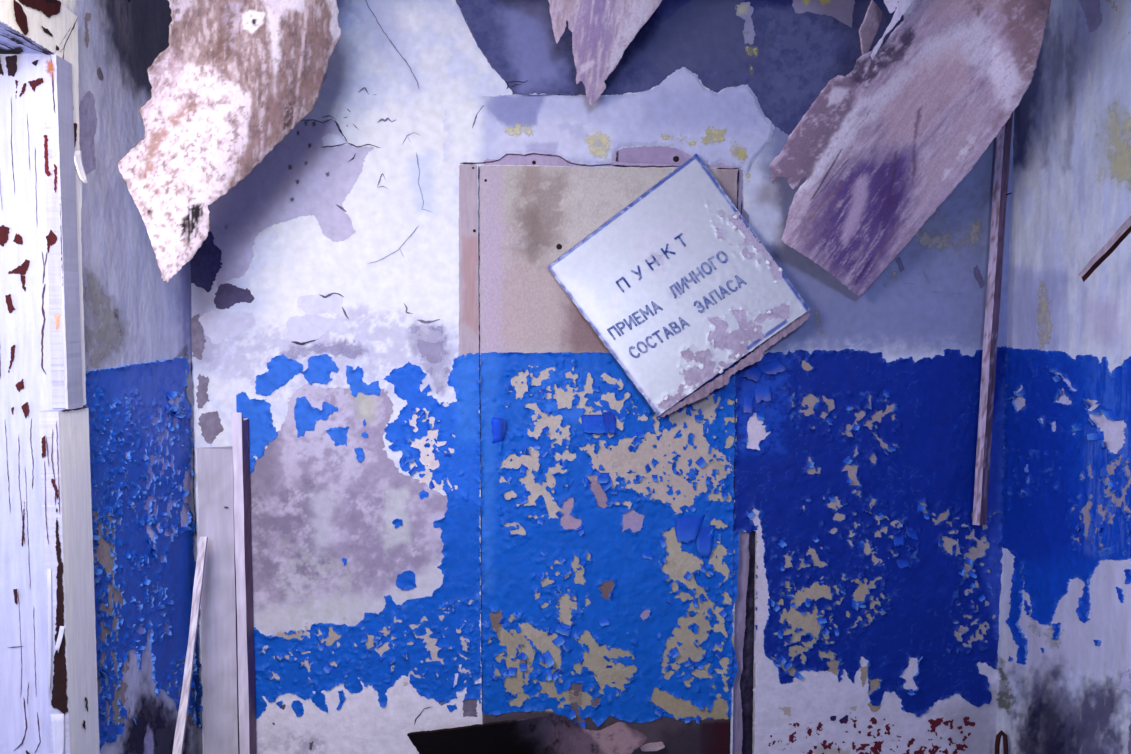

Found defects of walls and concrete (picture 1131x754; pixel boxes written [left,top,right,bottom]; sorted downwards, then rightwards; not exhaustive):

spalling [616,146,686,164]
spalling [83,314,224,735]
leakage [123,695,189,754]
flaking render [250,384,637,754]
flaking render [499,358,997,754]
leakage [1014,669,1131,754]